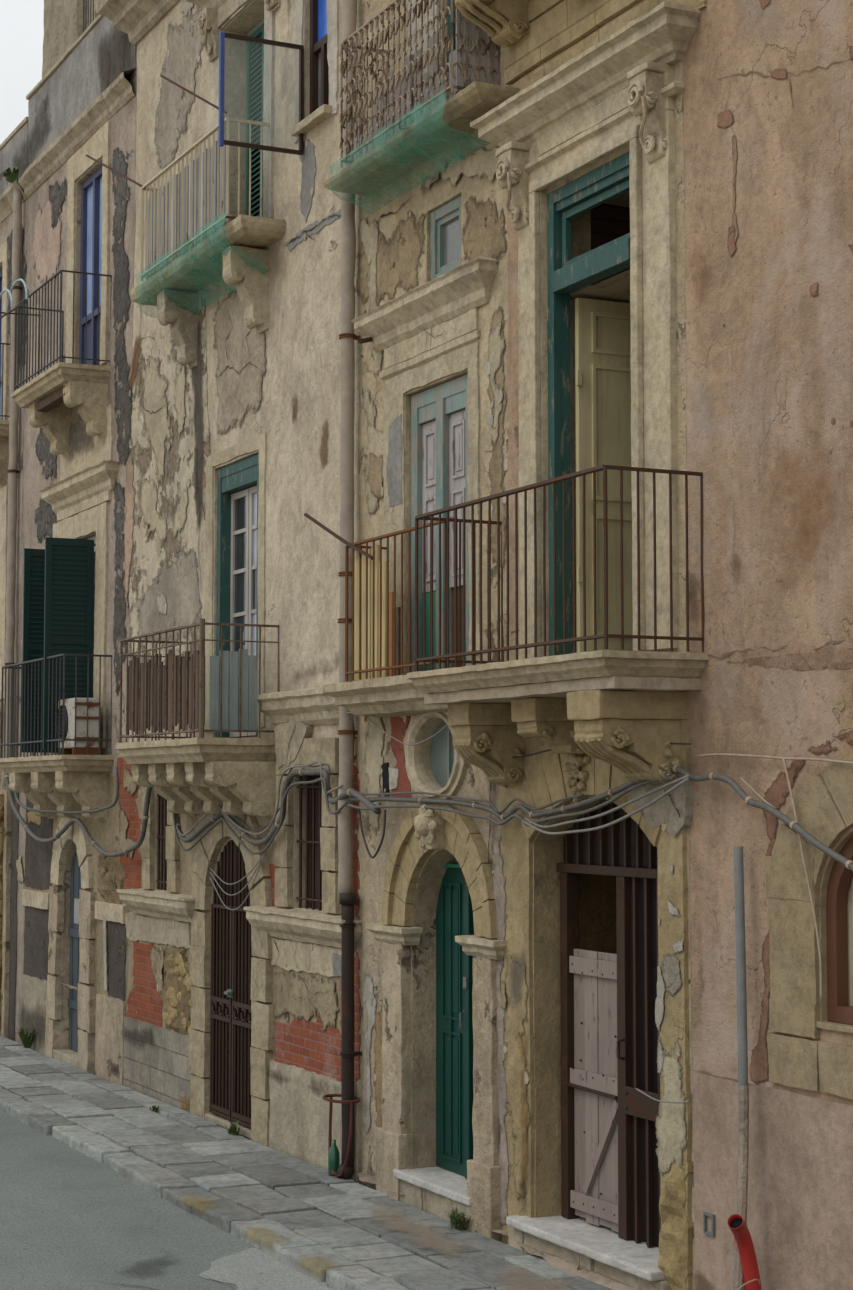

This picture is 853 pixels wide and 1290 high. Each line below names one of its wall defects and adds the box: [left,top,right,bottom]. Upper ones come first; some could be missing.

flaking render [154,0,205,170]
crack [716,45,851,111]
peeling [115,287,219,670]
flaking render [485,306,508,567]
crack [689,640,846,663]
spalling [97,758,194,1035]
flaking render [271,937,377,1140]
spalling [655,938,694,1290]